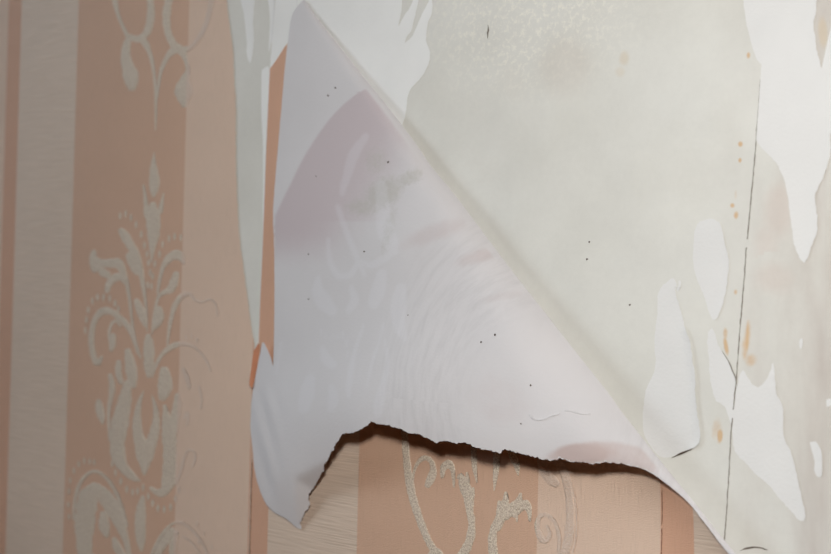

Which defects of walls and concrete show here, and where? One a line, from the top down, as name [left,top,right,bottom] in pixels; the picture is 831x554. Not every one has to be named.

peeling [249,0,735,554]
peeling [693,219,806,521]
peeling [743,0,831,263]
peeling [810,441,822,477]